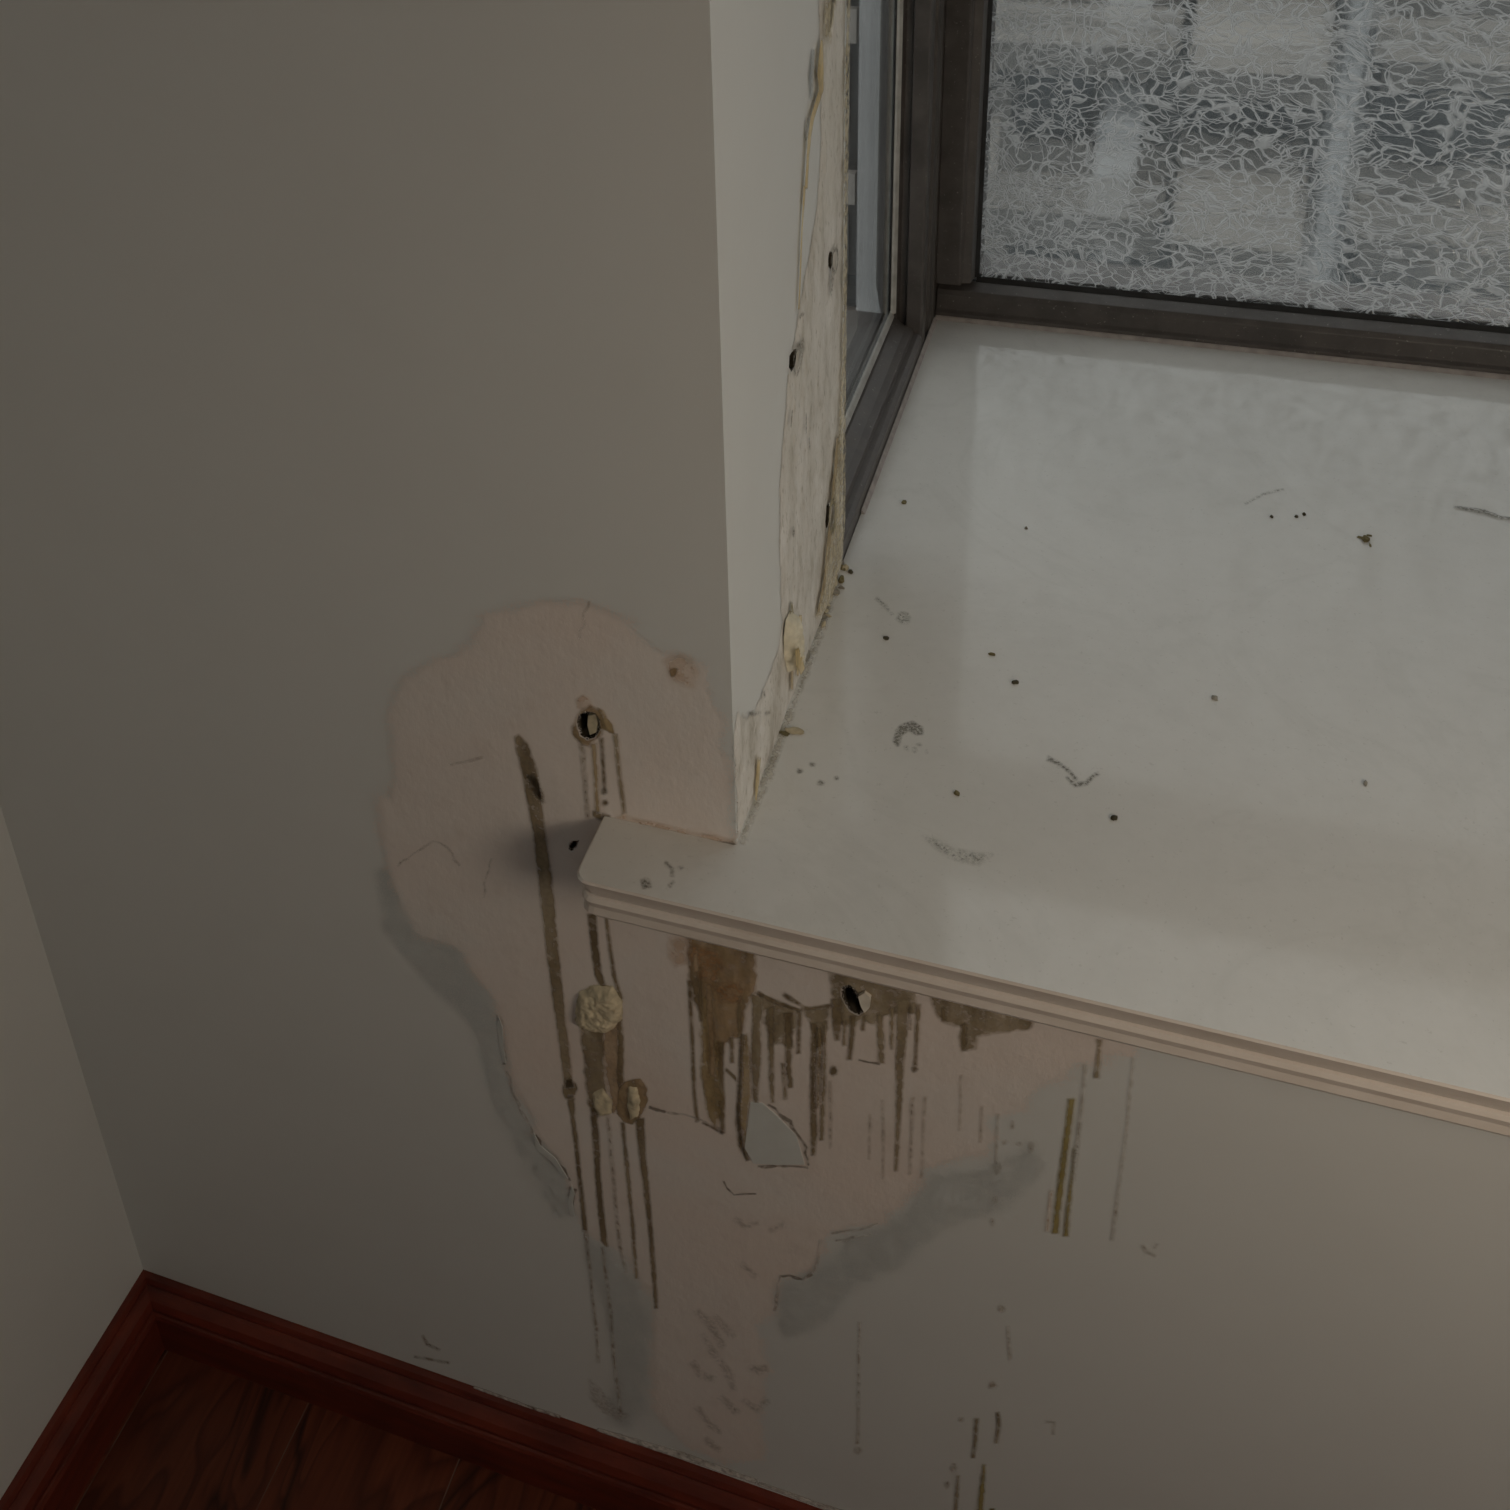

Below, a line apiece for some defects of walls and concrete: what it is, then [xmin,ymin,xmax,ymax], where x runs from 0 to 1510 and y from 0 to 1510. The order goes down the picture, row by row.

peeling [369,0,1140,1471]
damp [688,938,830,1160]
damp [931,997,1032,1050]